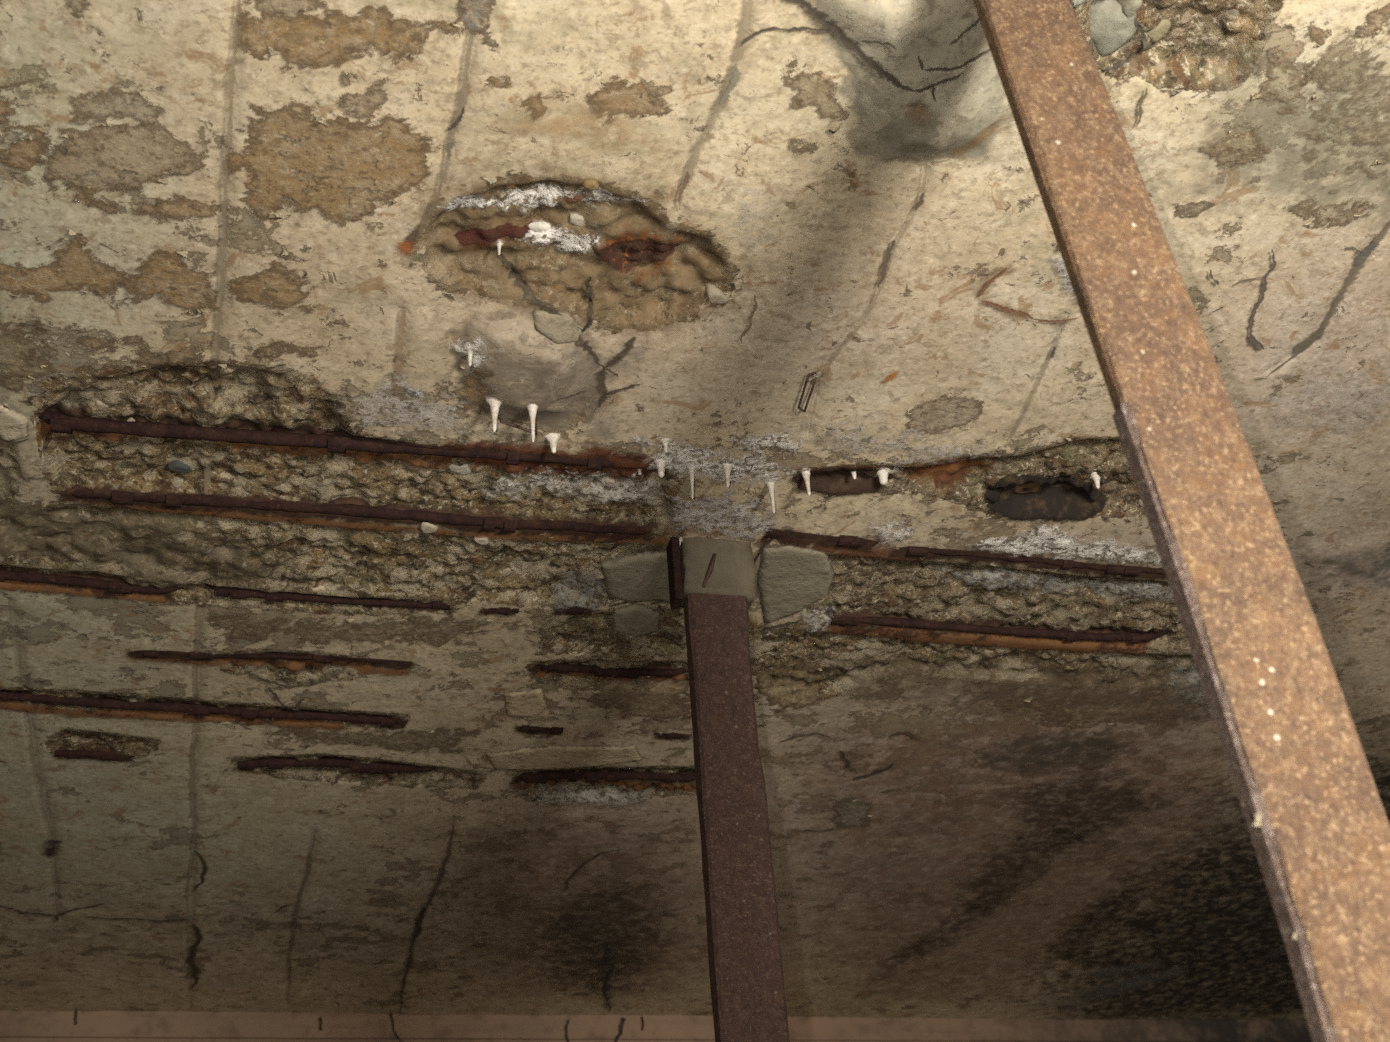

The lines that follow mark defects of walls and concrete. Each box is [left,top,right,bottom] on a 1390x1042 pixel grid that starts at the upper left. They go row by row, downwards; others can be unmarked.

crack [741,0,990,101]
spalling [1070,0,1390,229]
spalling [0,0,740,335]
crack [1209,250,1276,349]
water stain [449,337,573,418]
spalling [0,229,692,740]
rust [235,440,657,479]
water stain [481,414,986,544]
rust [902,458,993,493]
spalling [789,435,1145,523]
rust [819,622,1149,654]
water stain [522,784,651,808]